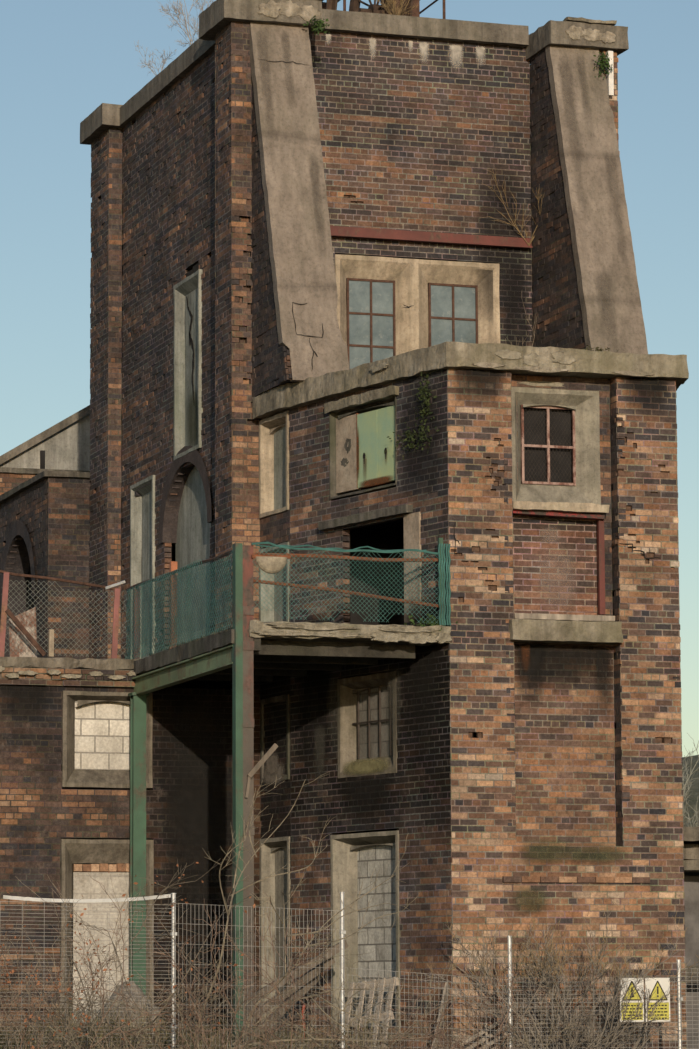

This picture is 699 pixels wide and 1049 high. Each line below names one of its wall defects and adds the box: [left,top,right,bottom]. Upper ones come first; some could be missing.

spalling [257,0,322,22]
water stain [409,41,428,58]
water stain [450,45,462,62]
spalling [565,25,616,44]
crack [186,297,194,400]
crack [292,302,324,370]
spalling [472,349,577,387]
corrosion [357,432,391,487]
spalling [614,533,655,564]